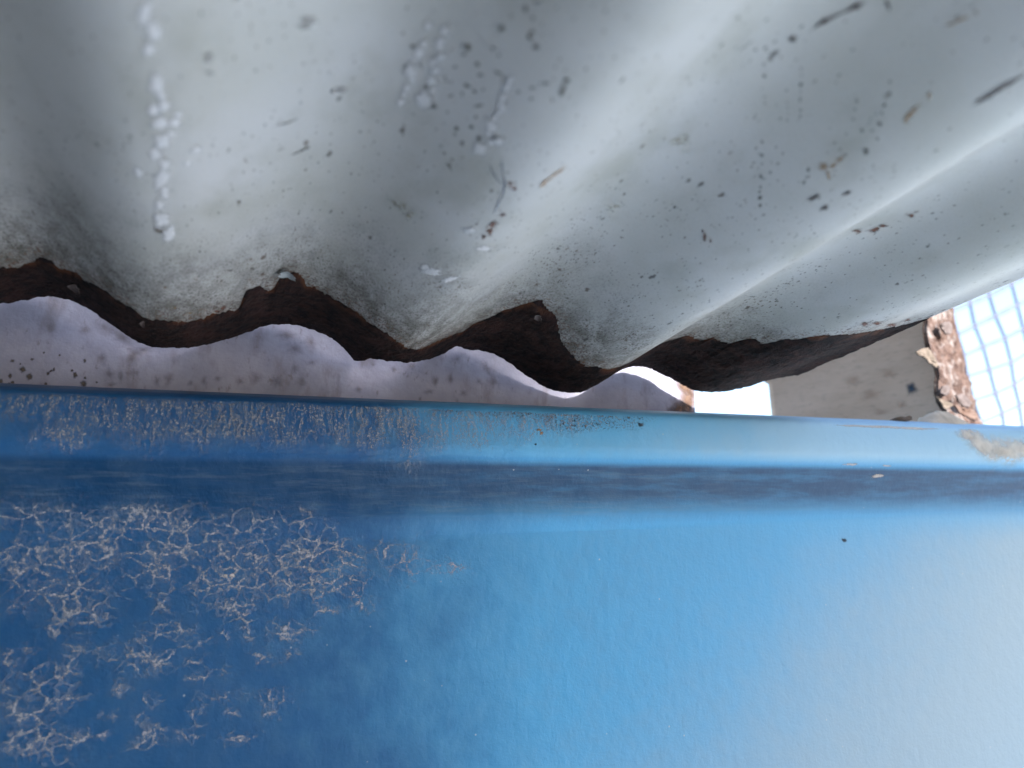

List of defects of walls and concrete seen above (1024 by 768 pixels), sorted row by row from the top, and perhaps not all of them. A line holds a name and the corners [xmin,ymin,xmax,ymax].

leakage [0,352,587,463]
rust [0,257,929,412]